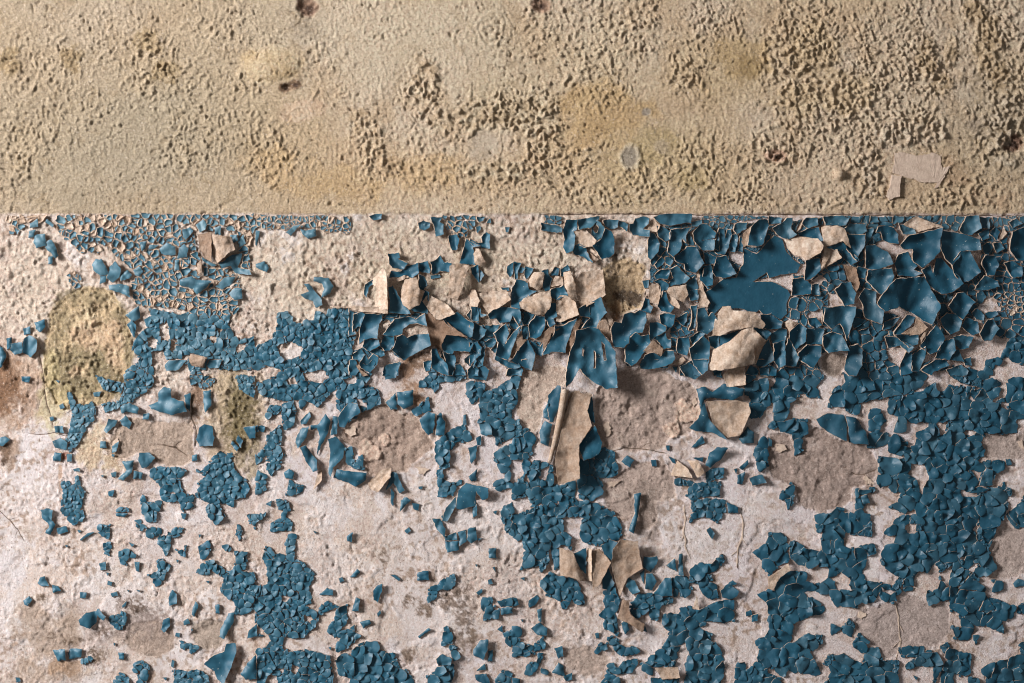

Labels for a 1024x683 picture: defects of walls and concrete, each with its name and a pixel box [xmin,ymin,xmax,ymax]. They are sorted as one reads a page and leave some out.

flaking render [0,185,1024,683]